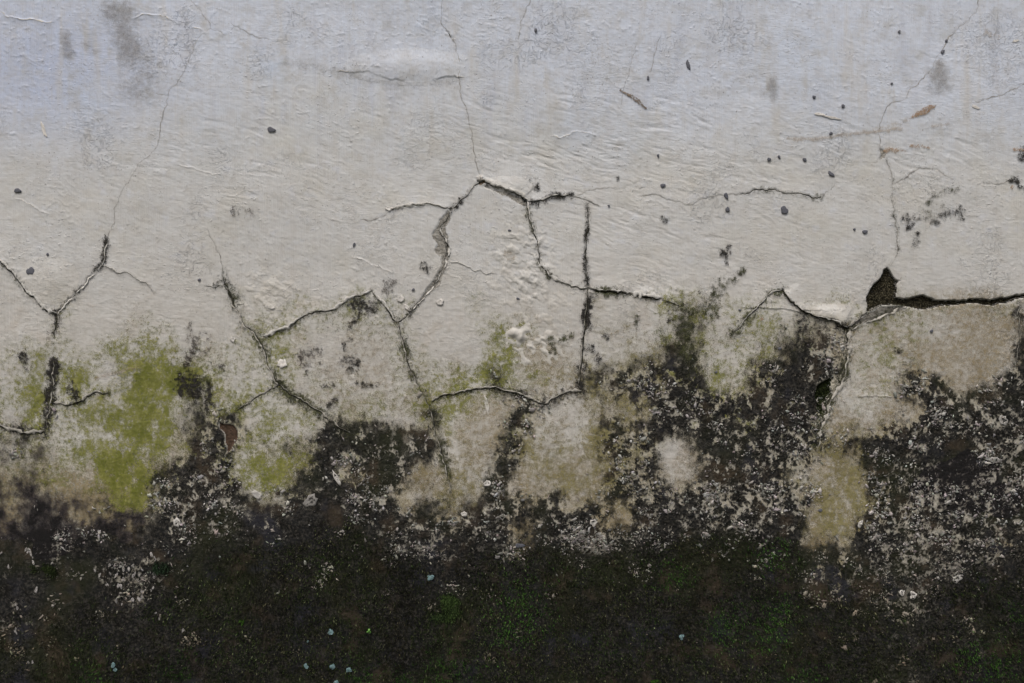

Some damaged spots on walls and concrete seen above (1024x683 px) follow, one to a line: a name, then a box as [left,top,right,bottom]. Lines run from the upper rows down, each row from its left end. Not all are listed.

crack [0,3,269,442]
crack [206,8,681,504]
crack [643,184,835,205]
crack [726,288,906,447]
spalling [856,268,1024,324]
crack [1011,302,1024,372]
leakage [0,245,1024,683]